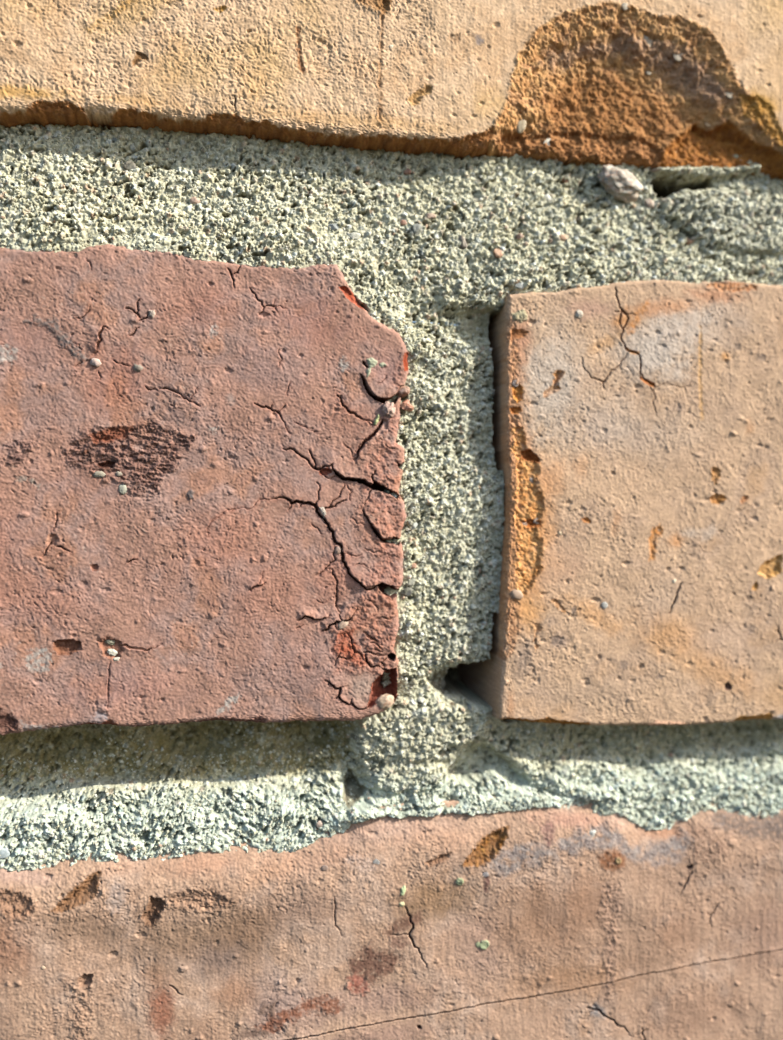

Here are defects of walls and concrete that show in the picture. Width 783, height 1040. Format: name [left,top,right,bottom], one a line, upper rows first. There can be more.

spalling [0,0,783,180]
crack [582,289,690,413]
spalling [60,418,198,498]
crack [207,350,395,710]
crack [587,1005,649,1040]